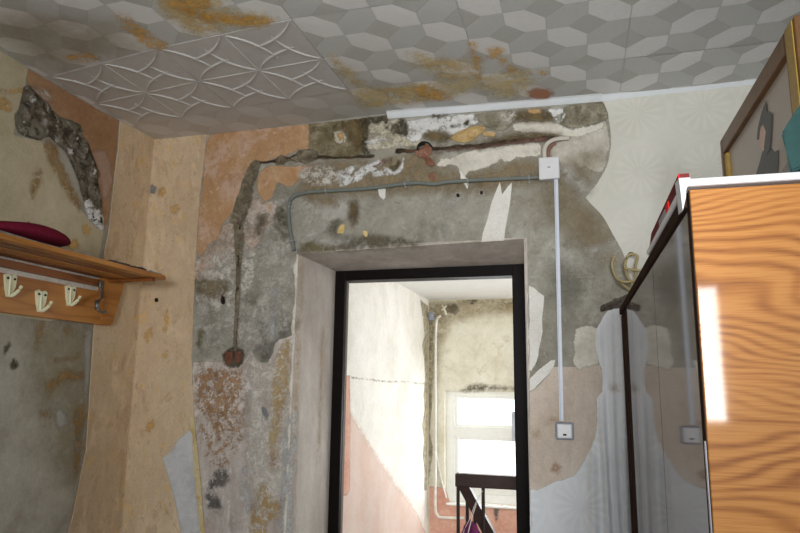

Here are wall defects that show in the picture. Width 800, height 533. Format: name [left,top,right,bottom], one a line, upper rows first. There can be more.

damp [160,0,271,32]
spalling [15,70,119,230]
flaking render [197,124,314,257]
peeling [337,157,404,186]
peeling [365,119,400,144]
damp [343,56,552,106]
spalling [451,125,496,143]
spalling [560,102,608,128]
spalling [489,238,530,442]
rust [195,366,244,466]
peeling [192,252,310,533]
peeling [420,300,437,490]